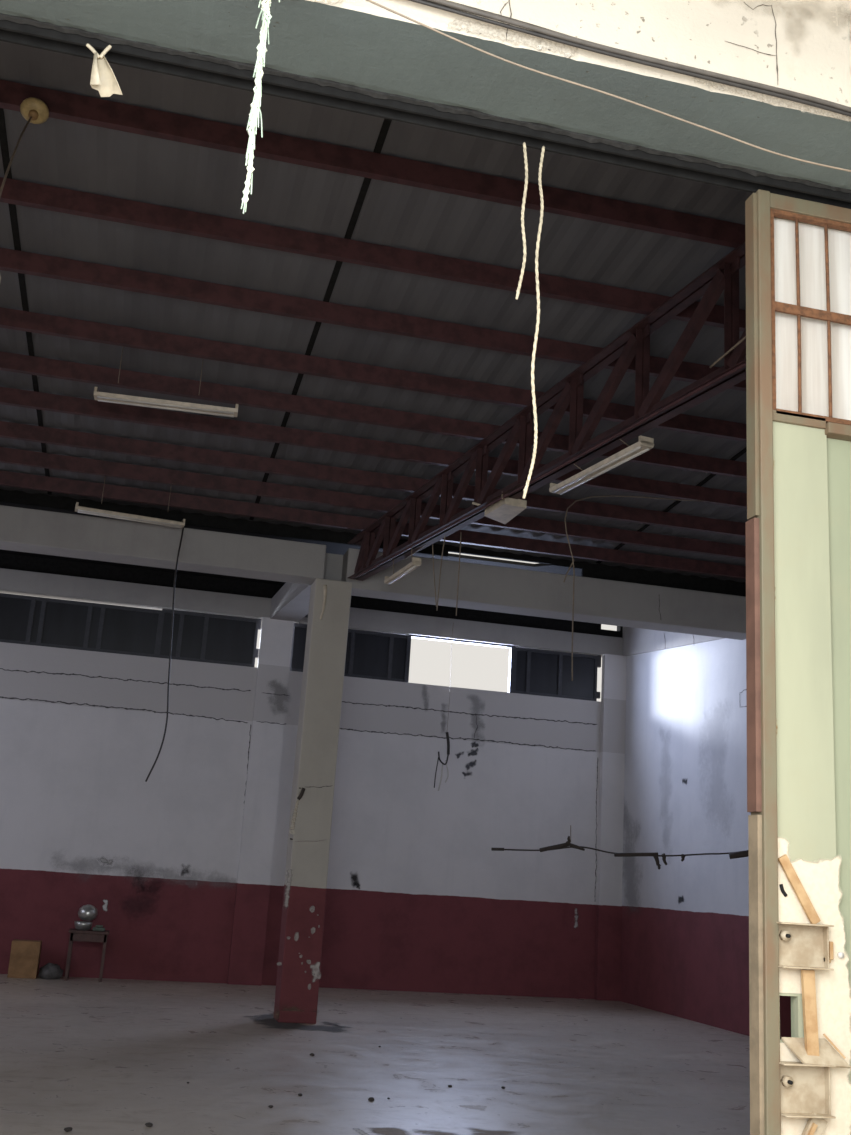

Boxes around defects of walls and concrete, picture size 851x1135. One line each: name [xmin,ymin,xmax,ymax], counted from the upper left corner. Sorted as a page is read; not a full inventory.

crack [726,2,778,80]
peeling [287,906,321,990]
peeling [778,838,851,1135]